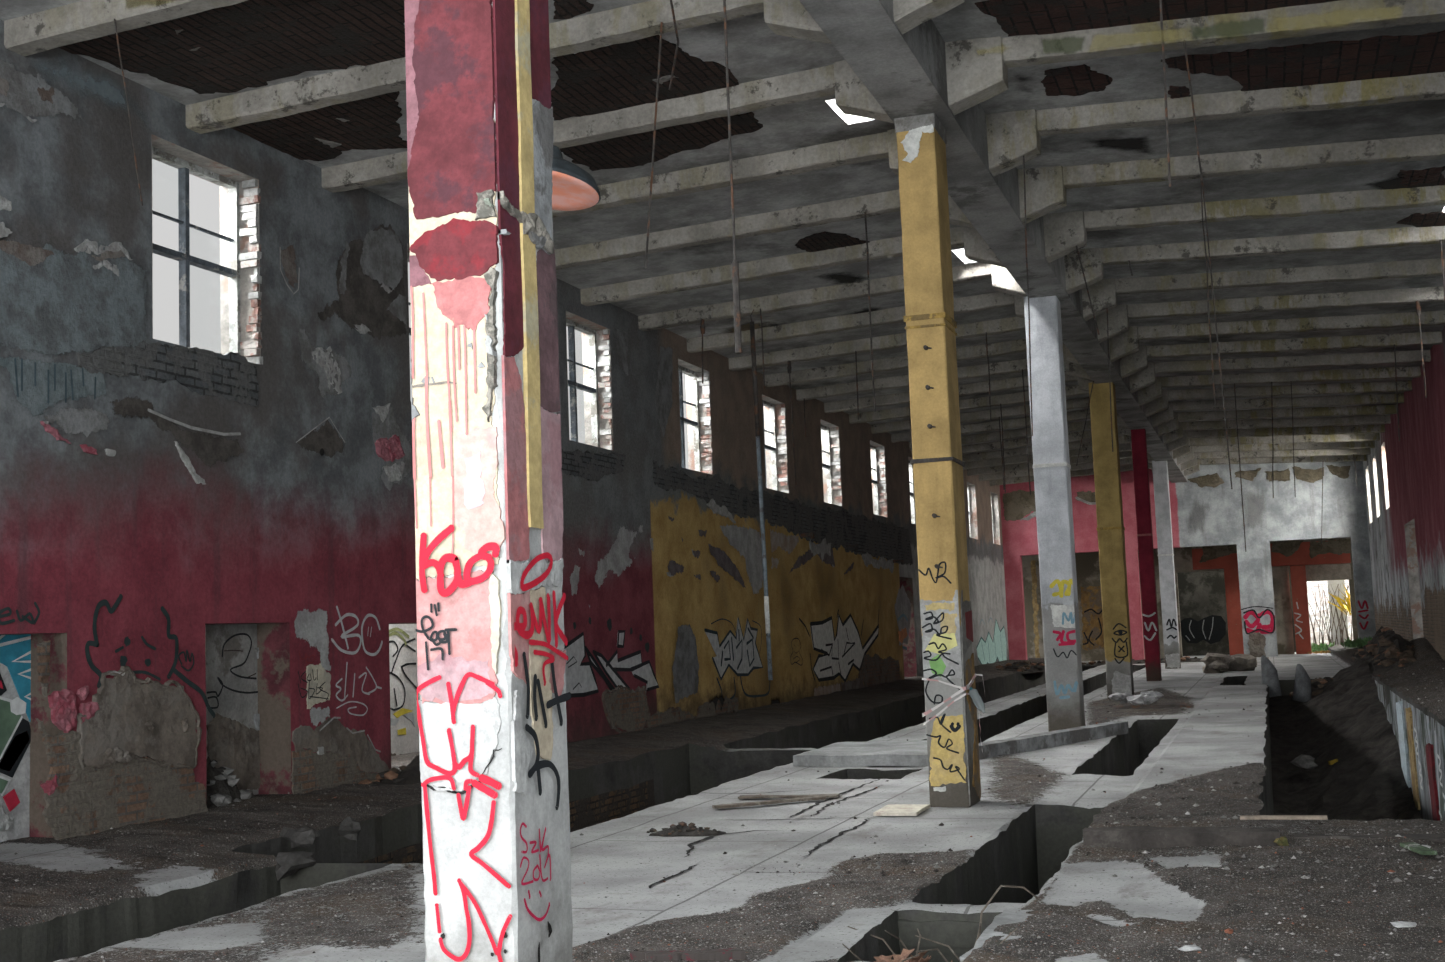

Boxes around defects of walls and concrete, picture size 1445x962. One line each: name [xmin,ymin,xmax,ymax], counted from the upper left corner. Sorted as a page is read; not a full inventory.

peeling [1041,64,1113,96]
peeling [0,196,259,407]
spalling [482,267,499,422]